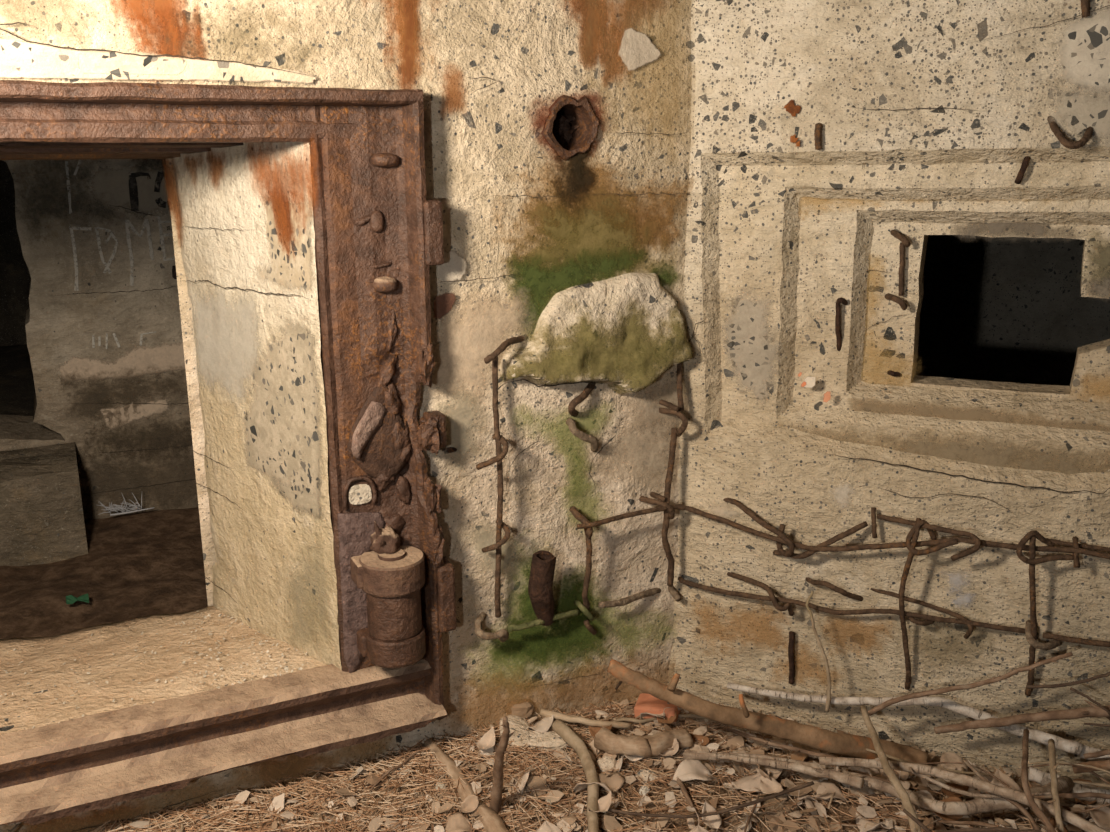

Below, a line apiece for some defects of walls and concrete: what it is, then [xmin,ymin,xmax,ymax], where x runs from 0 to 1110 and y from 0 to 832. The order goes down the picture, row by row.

rust [121,0,202,58]
rust [571,0,622,80]
rust [253,152,316,238]
damp [524,152,683,247]
damp [656,270,676,284]
rust [376,311,413,534]
spalling [474,526,513,574]
damp [556,582,590,617]